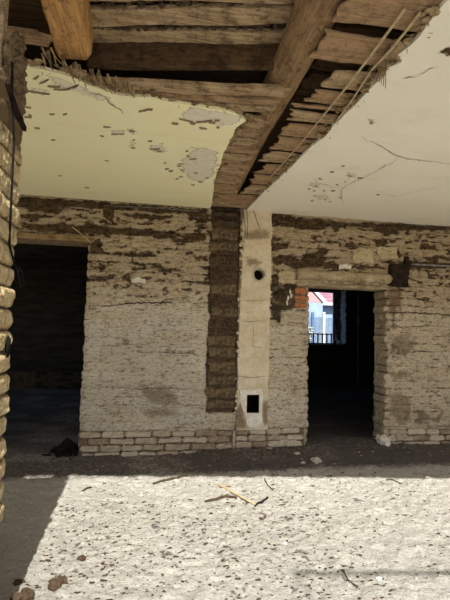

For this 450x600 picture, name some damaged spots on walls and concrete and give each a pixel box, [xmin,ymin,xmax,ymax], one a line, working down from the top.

peeling [0,30,108,119]
peeling [100,126,136,149]
peeling [171,108,240,130]
peeling [164,147,219,186]
peeling [308,165,362,202]
spalling [270,215,450,306]
spalling [4,196,241,412]
crack [88,298,175,310]
peeling [335,290,347,344]